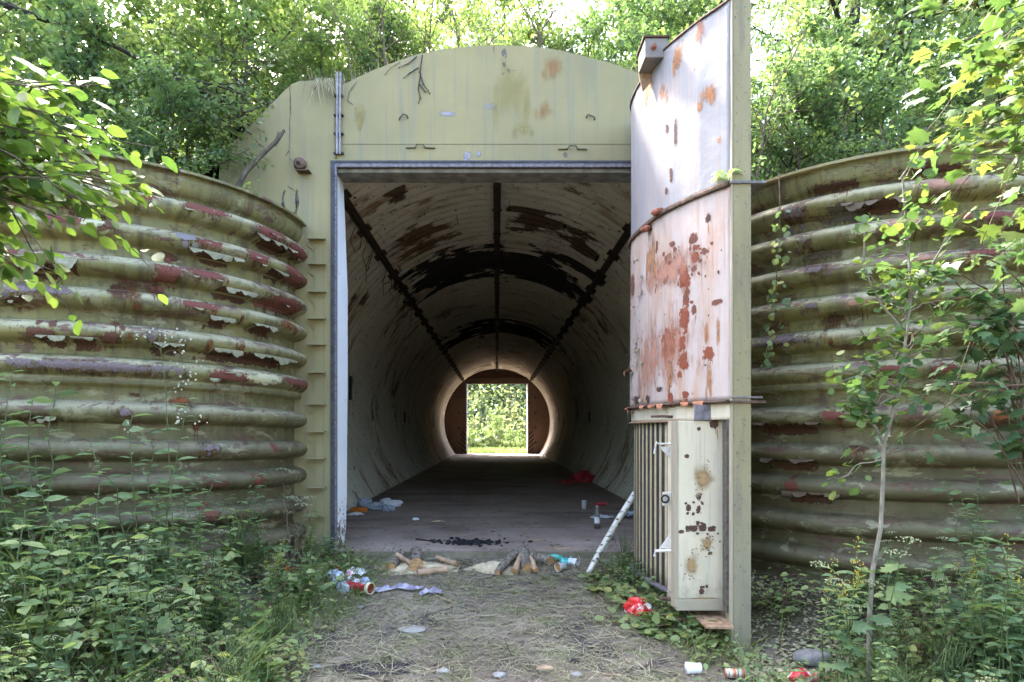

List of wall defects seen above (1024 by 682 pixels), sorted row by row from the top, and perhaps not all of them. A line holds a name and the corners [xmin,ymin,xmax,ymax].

rust [673,48,681,74]
rust [697,85,715,111]
peeling [1,255,79,300]
peeling [80,218,105,227]
peeling [175,232,245,268]
peeling [211,286,258,305]
peeling [202,315,278,340]
peeling [252,235,298,284]
rust [623,213,723,407]
peeling [778,196,909,276]
peeling [4,327,298,386]
rust [678,460,721,599]